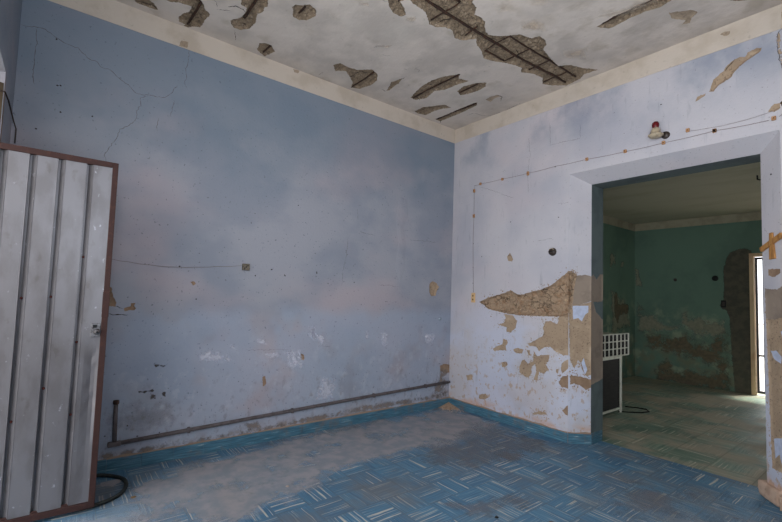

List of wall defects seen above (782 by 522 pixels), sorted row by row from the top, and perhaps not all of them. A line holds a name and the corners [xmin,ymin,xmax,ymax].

spalling [135,0,158,10]
spalling [167,0,210,27]
spalling [230,0,268,30]
spalling [597,0,698,28]
spalling [388,0,597,86]
spalling [334,63,378,89]
flaking render [695,48,762,102]
flaking render [480,267,603,395]
flaking render [764,312,782,477]